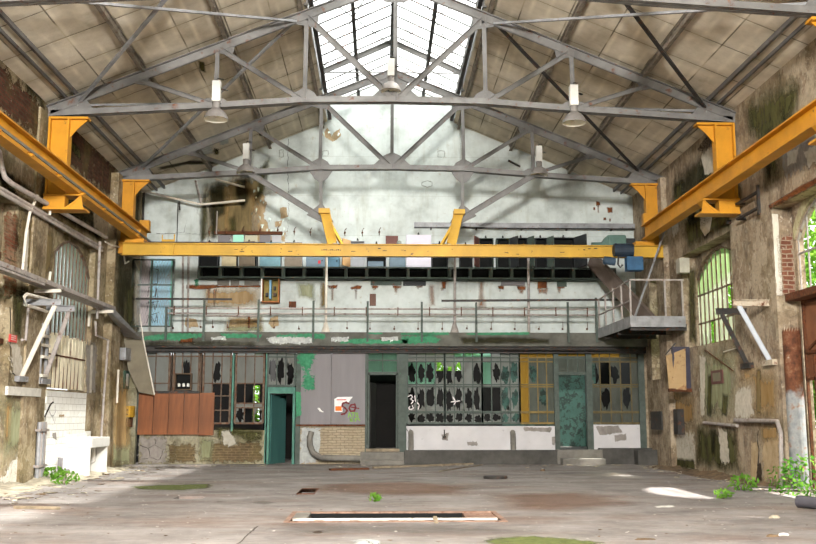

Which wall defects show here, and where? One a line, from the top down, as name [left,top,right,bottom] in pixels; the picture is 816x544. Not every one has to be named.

flaking render [168,439,263,464]